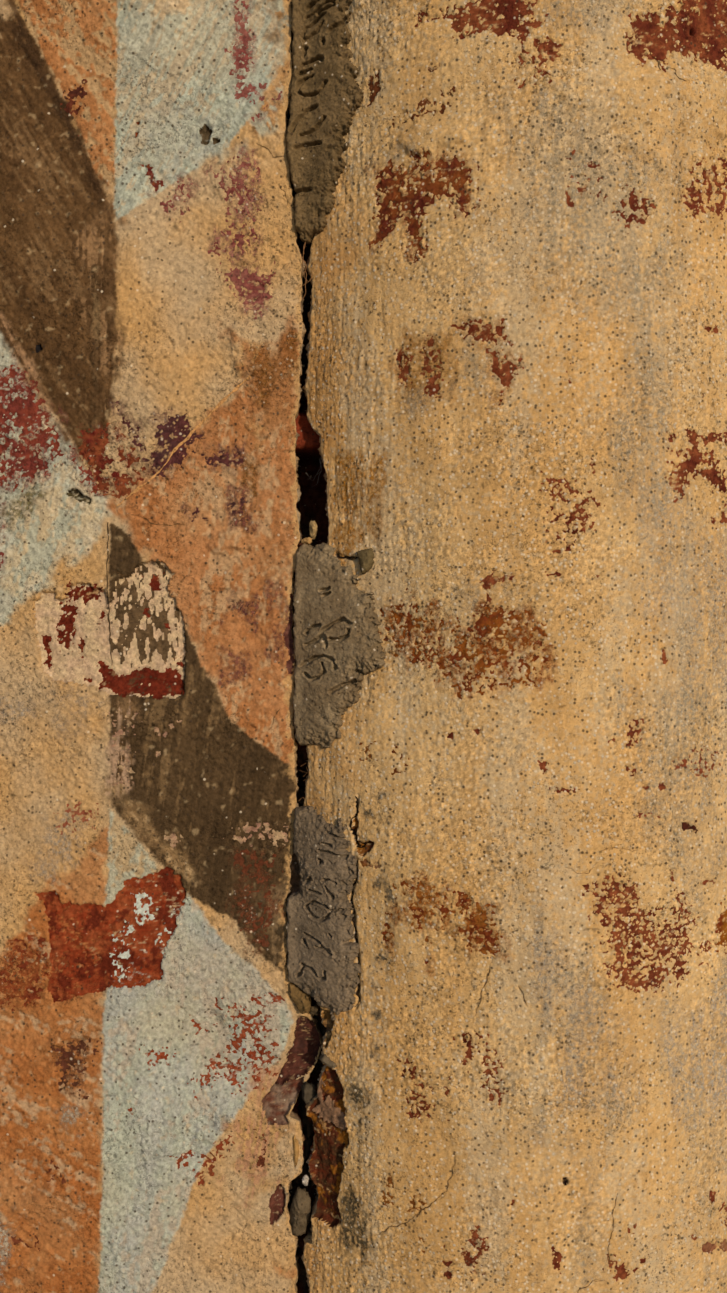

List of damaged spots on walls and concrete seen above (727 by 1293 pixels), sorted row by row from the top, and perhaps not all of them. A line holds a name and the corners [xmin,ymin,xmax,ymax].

crack [294,232,358,612]
crack [268,710,309,807]
crack [286,854,301,922]
crack [349,796,370,1007]
peeling [139,1045,176,1070]
spalling [187,992,349,1228]
crack [289,996,327,1293]